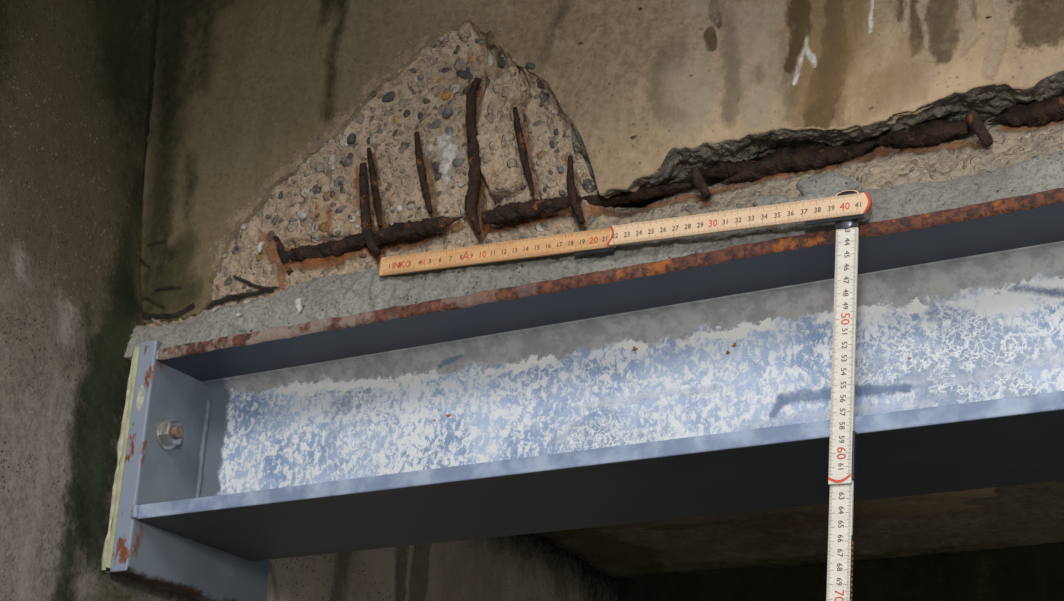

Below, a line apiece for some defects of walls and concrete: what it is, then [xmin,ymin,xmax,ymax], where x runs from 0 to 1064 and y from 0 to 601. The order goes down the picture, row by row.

leakage [704,0,722,51]
leakage [784,0,847,129]
leakage [897,0,1064,77]
spalling [145,11,599,327]
rust [258,140,984,288]
leakage [52,486,89,601]